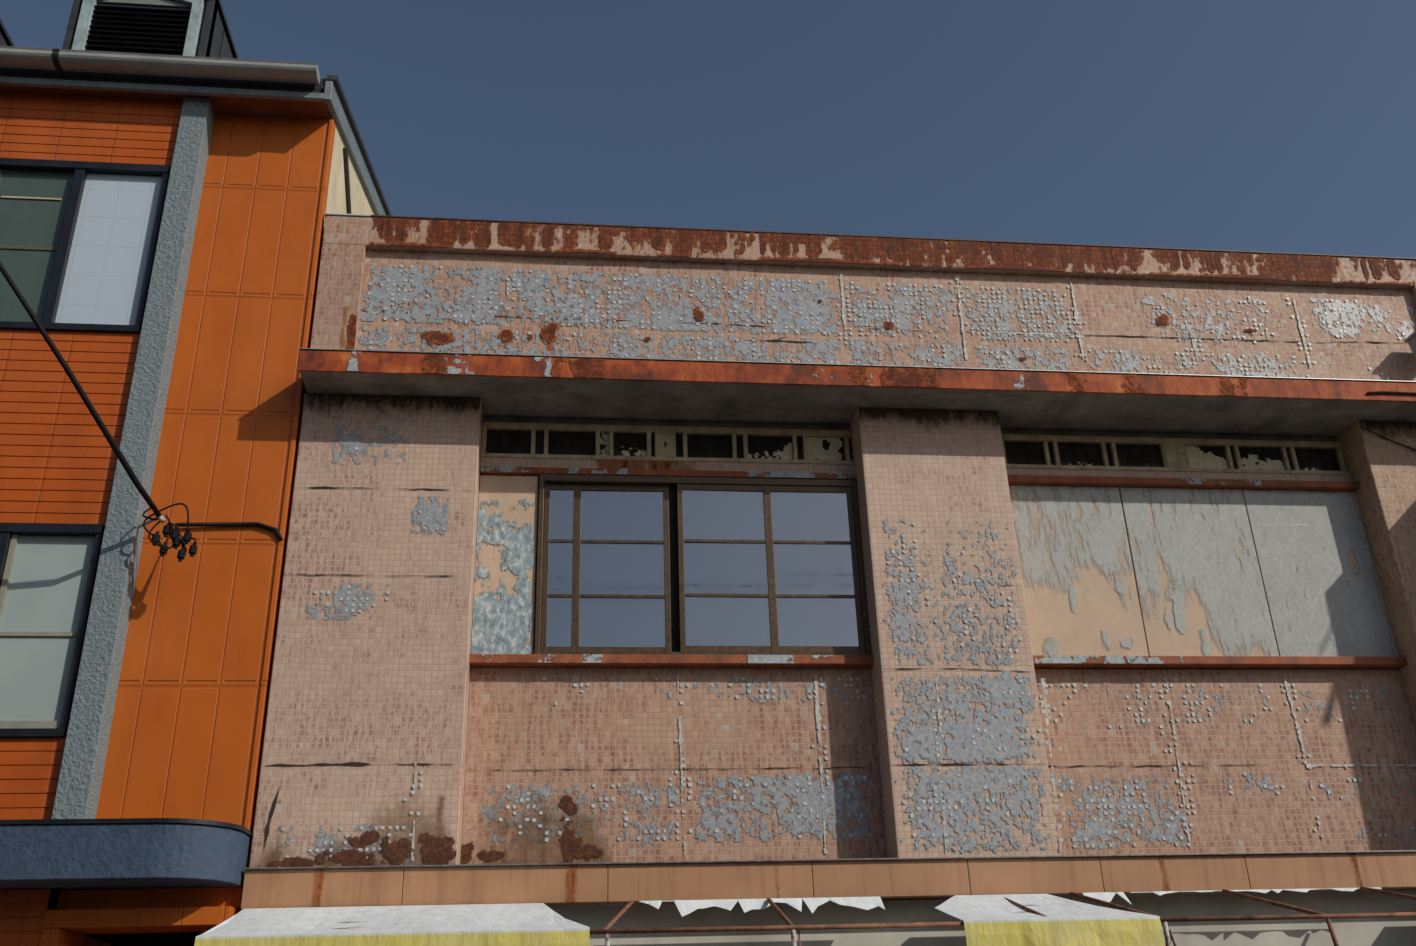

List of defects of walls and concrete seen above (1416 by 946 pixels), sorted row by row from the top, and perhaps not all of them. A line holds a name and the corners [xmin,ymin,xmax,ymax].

rust [370,217,1416,285]
peeling [347,263,1416,389]
rust [846,366,940,387]
peeling [568,446,646,474]
peeling [746,437,856,479]
peeling [412,496,449,535]
peeling [306,583,392,620]
peeling [471,498,605,684]
peeling [880,446,1394,853]
peeling [258,655,877,867]
peeling [1313,766,1416,842]